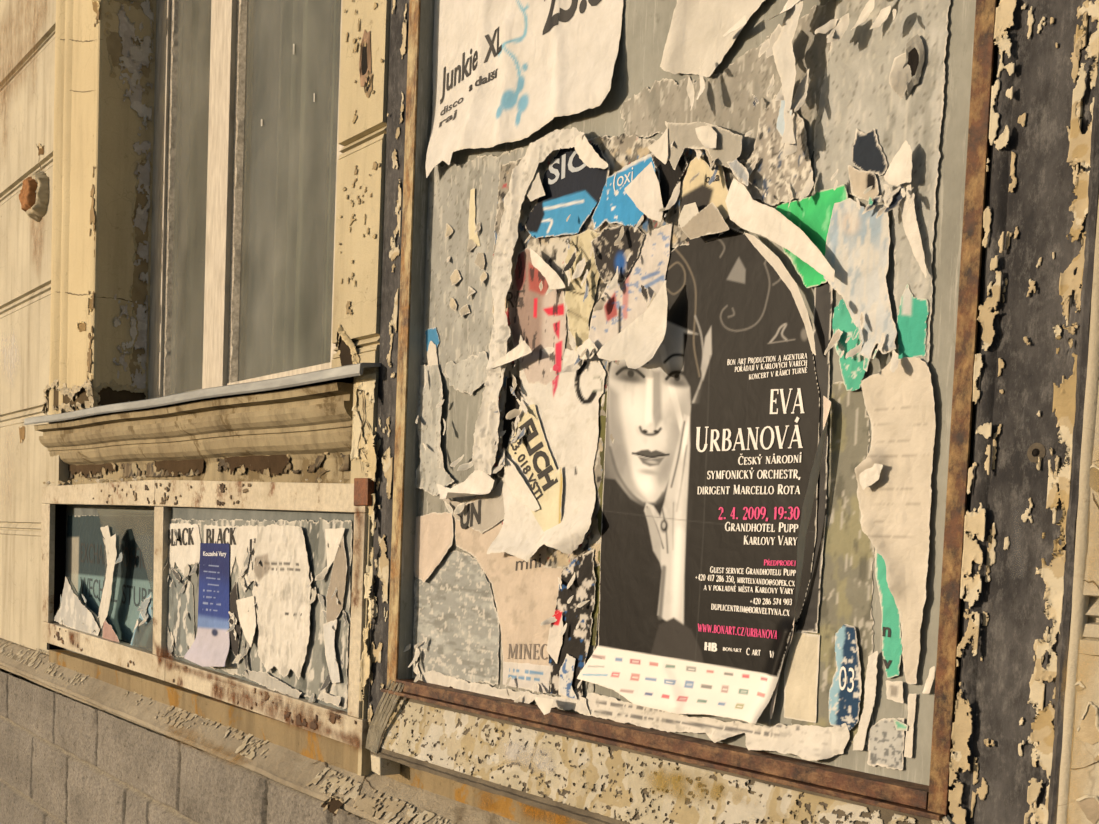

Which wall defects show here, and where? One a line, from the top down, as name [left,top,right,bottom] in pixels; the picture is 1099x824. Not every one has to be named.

peeling [42,0,155,415]
peeling [340,91,404,273]
peeling [986,0,1054,193]
peeling [973,206,1019,404]
corrosion [157,647,190,672]
peeling [68,301,393,726]
corrosion [207,675,359,748]
peeling [381,698,916,824]
peeling [948,682,988,824]
peeling [956,503,1010,667]
peeling [967,422,1002,494]
peeling [1018,0,1099,824]